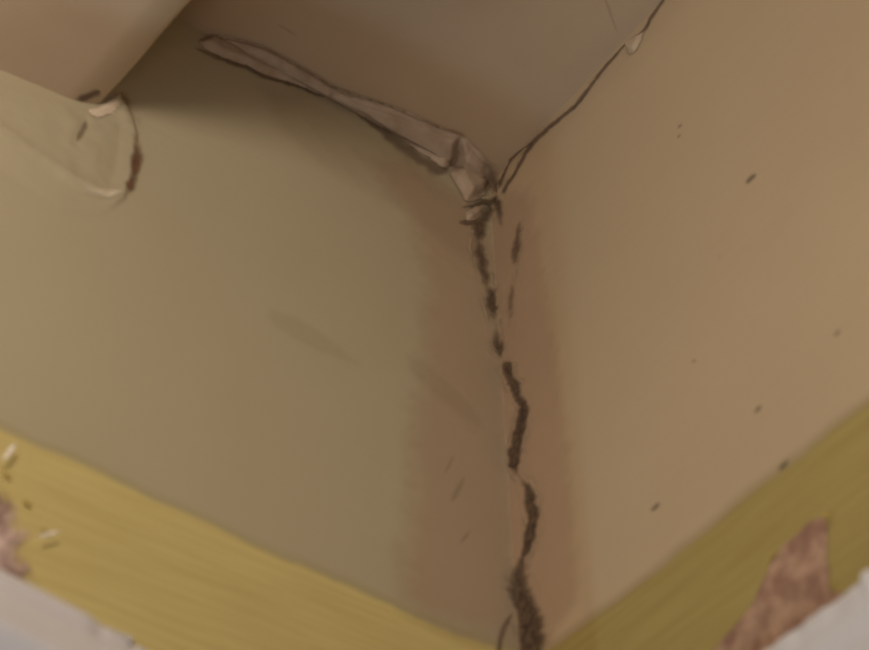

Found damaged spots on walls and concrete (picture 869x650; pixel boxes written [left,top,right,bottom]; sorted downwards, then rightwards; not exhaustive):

flaking render [198,34,492,202]
crack [461,0,664,315]
flaking render [0,498,29,579]
crack [492,339,544,650]
flaking render [715,513,845,650]